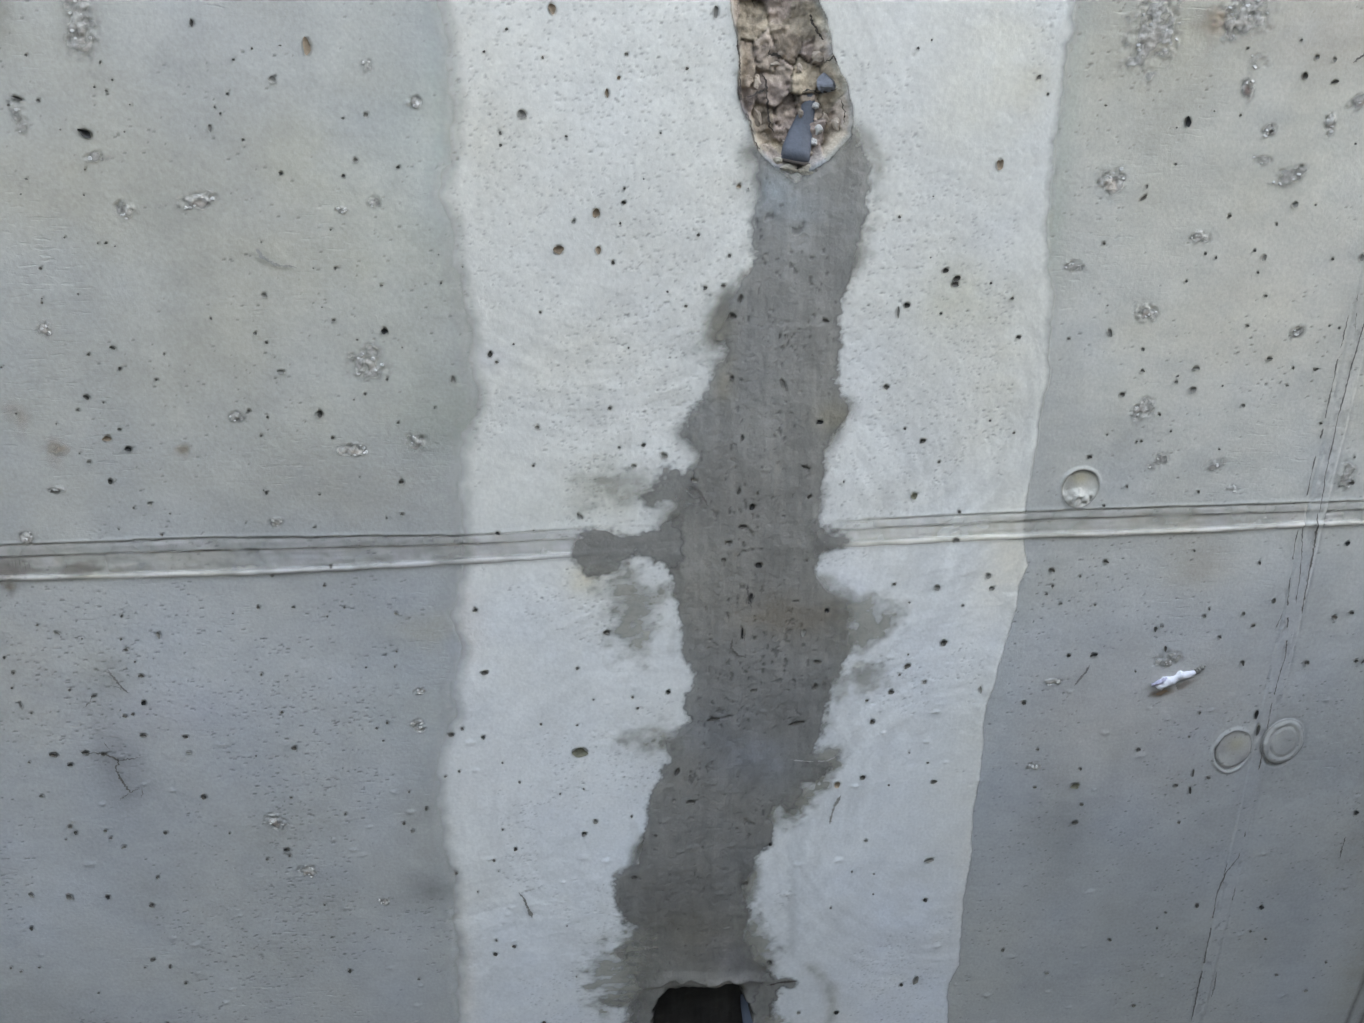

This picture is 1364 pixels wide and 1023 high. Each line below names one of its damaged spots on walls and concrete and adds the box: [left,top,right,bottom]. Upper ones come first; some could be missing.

spalling [730,0,853,175]
damp [572,128,897,1023]
crack [1258,295,1364,770]
crack [1191,832,1246,1019]